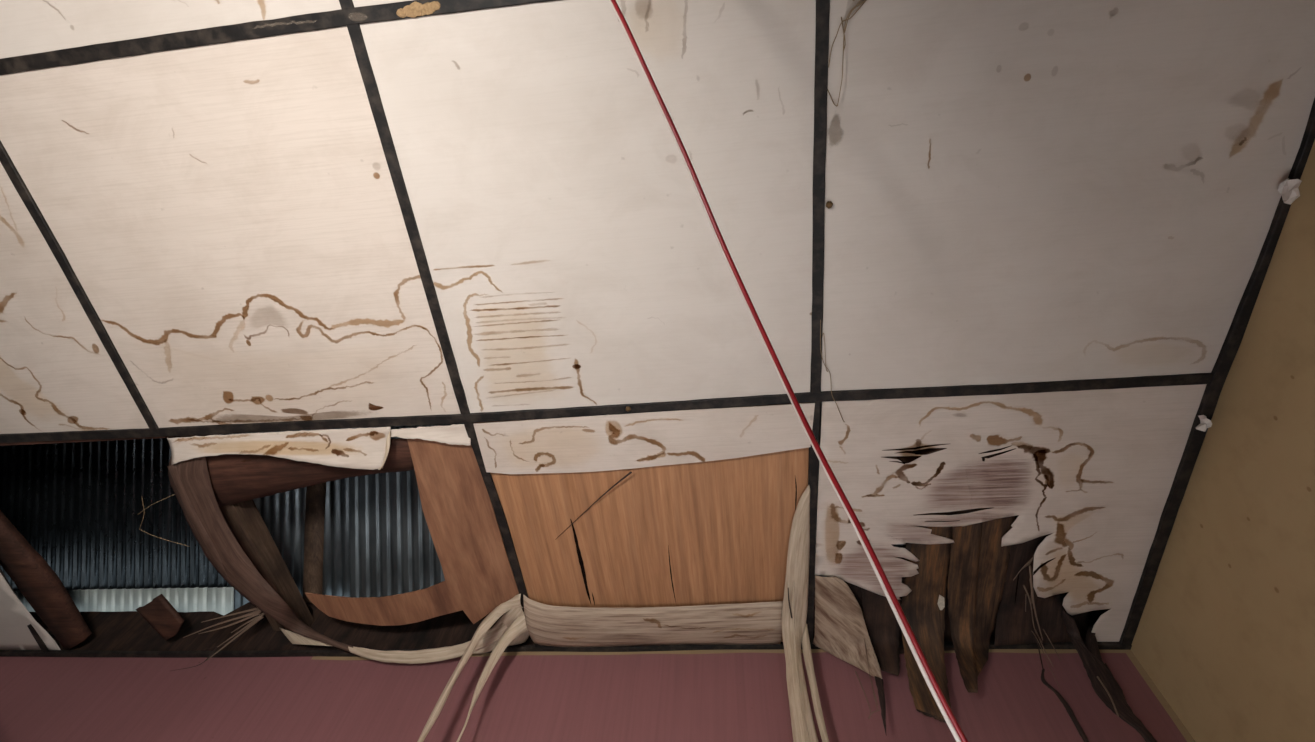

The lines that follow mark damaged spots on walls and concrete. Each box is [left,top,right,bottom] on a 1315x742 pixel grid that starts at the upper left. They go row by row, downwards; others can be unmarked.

damp [173,294,326,338]
damp [283,398,312,420]
damp [896,462,945,486]
damp [987,435,1062,531]
peeling [167,424,507,664]
crack [570,519,595,605]
damp [1041,525,1112,602]
peeling [813,575,886,733]